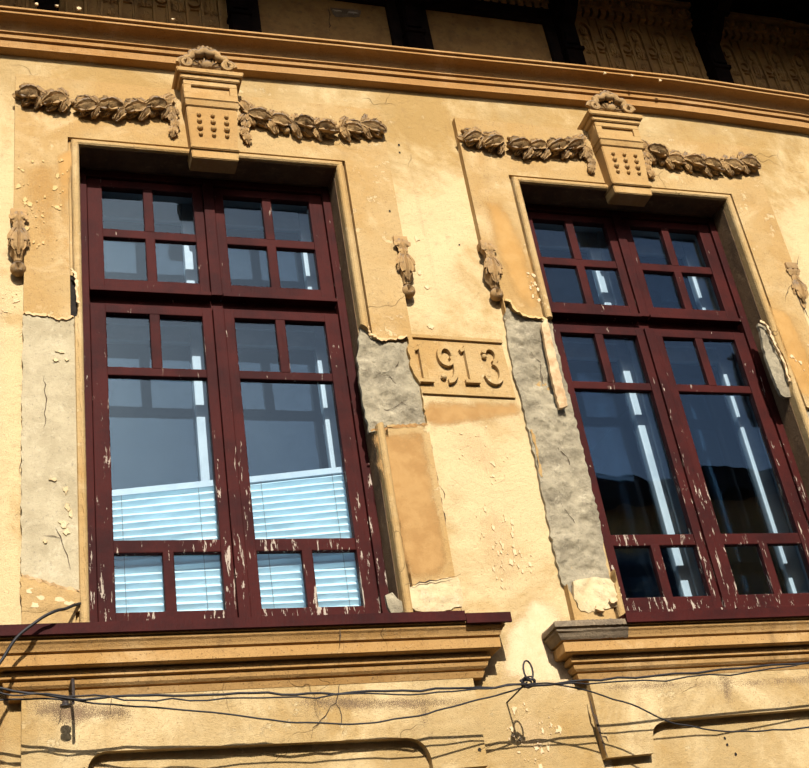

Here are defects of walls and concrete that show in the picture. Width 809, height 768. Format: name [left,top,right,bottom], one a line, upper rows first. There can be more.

flaking render [20,268,80,613]
flaking render [356,325,427,434]
flaking render [502,244,622,613]
flaking render [756,320,809,399]
peeling [507,702,562,768]